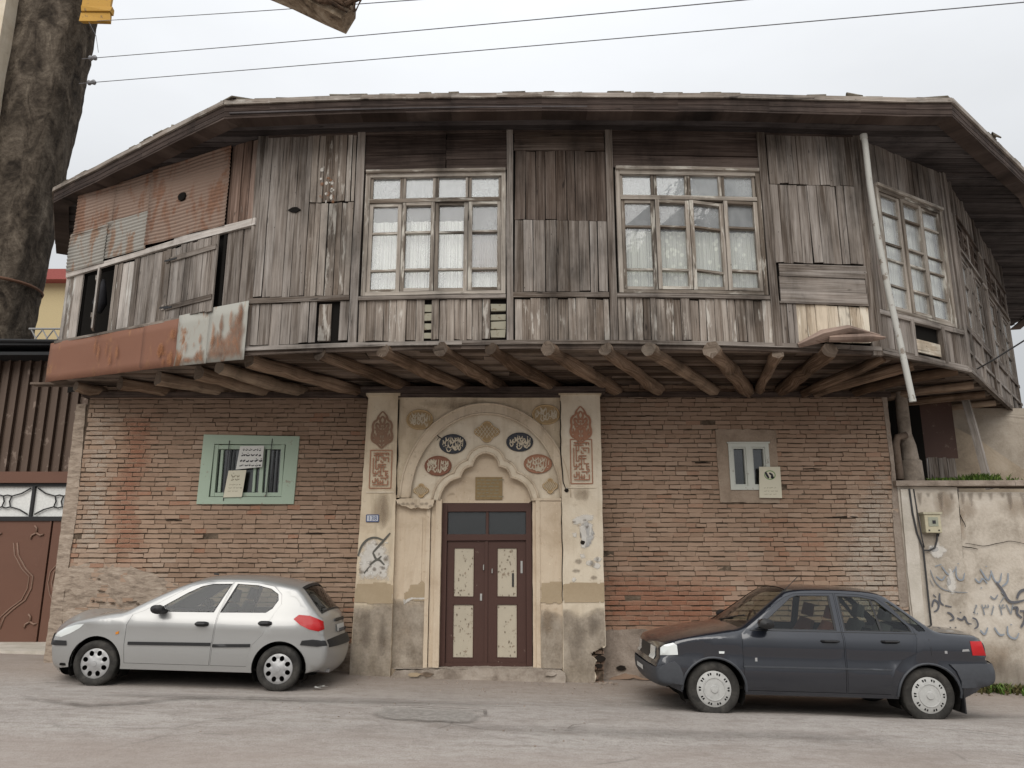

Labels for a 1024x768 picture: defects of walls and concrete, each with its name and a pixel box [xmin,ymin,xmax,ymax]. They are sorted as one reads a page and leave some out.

corrosion [158,305,242,364]
peeling [357,533,391,579]
peeling [573,515,601,569]
water stain [349,581,425,677]
water stain [541,583,712,683]
spalling [589,646,618,685]